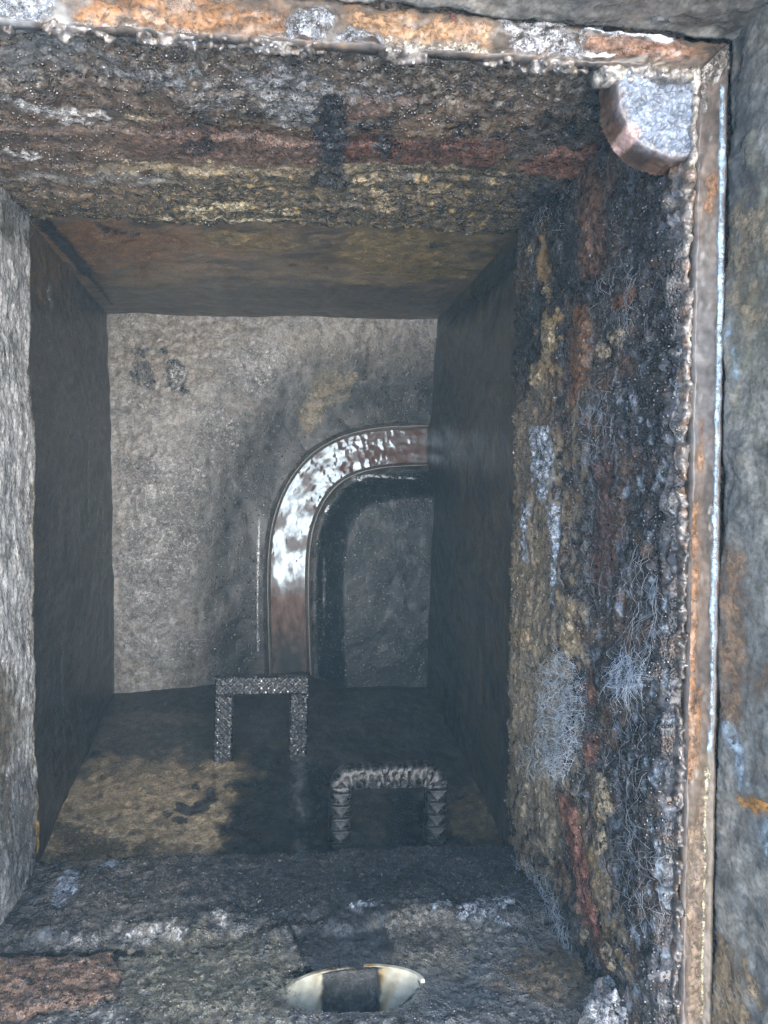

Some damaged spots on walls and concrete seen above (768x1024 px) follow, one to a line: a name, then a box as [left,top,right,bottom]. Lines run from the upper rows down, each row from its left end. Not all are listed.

rust [704,173,720,214]
damp [519,425,561,605]
damp [44,748,335,908]
rust [686,502,768,1024]